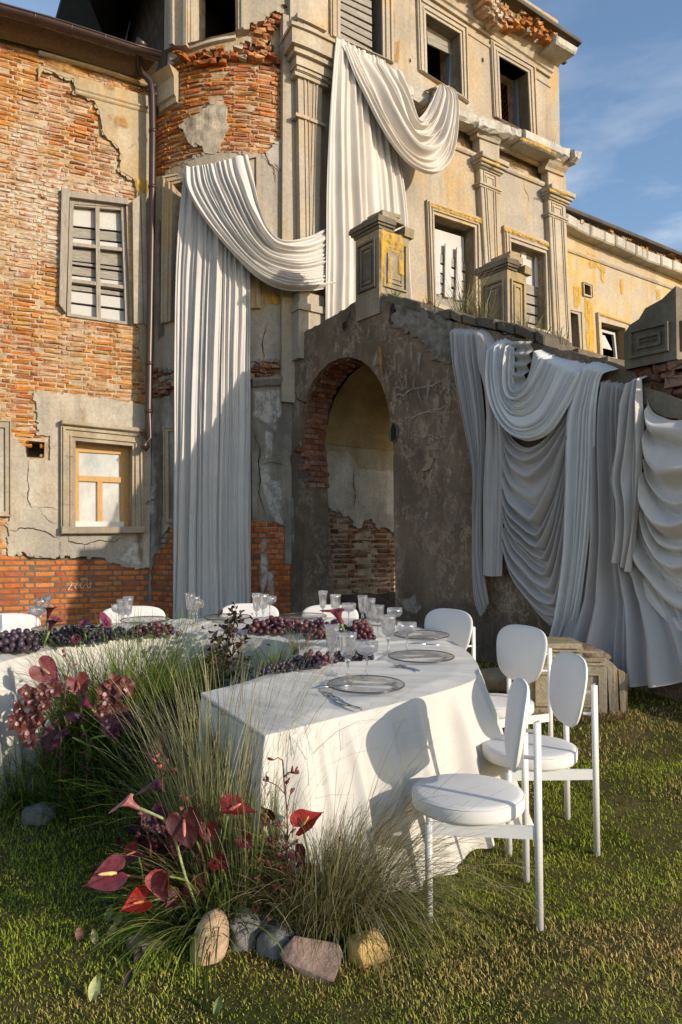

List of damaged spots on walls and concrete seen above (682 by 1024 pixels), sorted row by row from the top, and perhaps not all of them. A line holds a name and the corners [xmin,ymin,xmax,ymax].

spalling [250,3,288,39]
spalling [156,57,281,176]
spalling [0,39,157,448]
flaking render [0,516,102,560]
crack [13,463,126,550]
peeling [119,542,141,570]
flaking render [290,349,395,595]